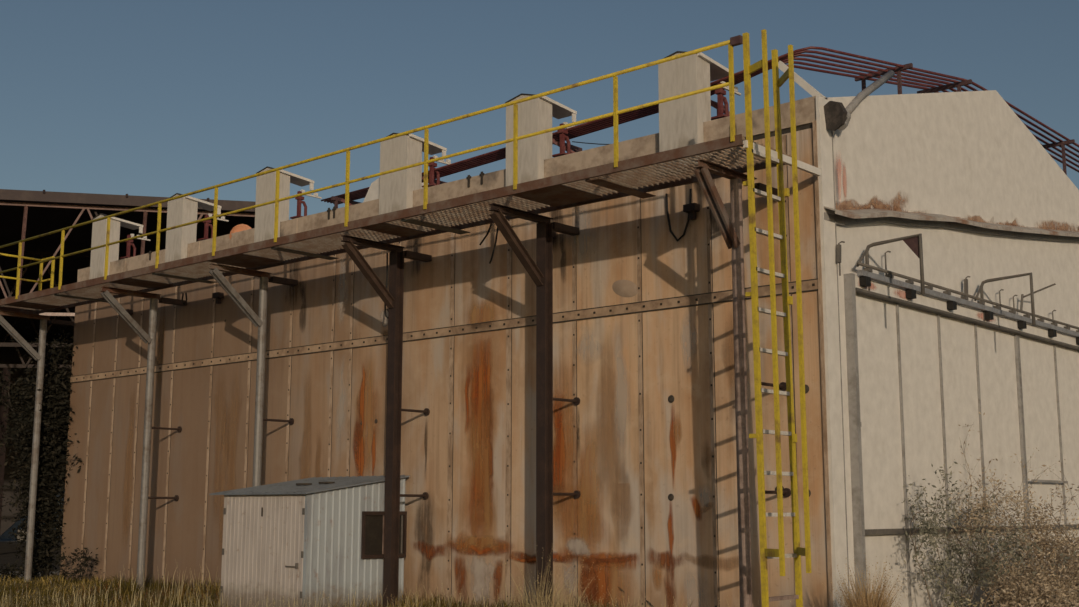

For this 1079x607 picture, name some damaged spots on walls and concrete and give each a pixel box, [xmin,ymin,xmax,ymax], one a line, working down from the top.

corrosion [353,368,375,476]
corrosion [465,347,493,530]
corrosion [670,417,681,479]
corrosion [512,552,536,563]
corrosion [553,393,636,607]
corrosion [651,506,679,607]
corrosion [692,498,711,519]